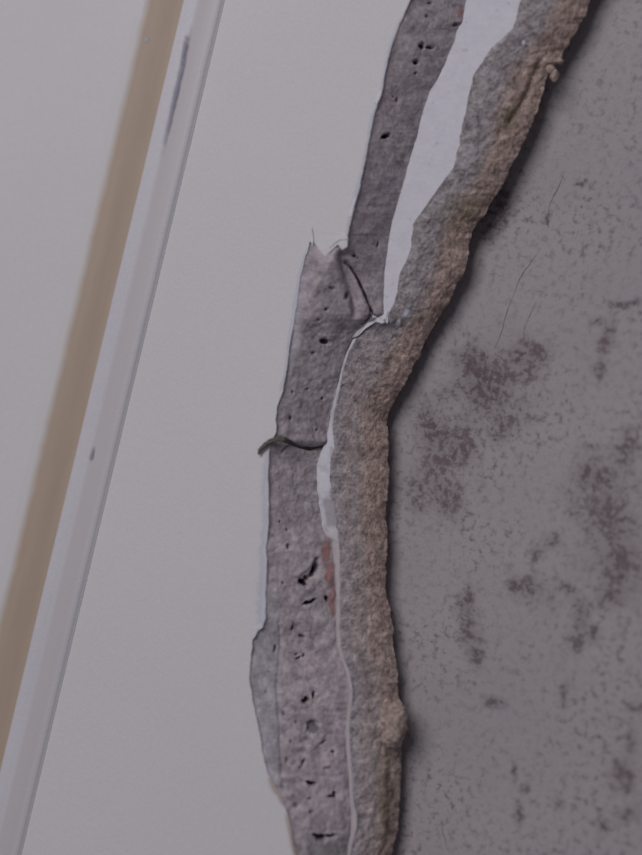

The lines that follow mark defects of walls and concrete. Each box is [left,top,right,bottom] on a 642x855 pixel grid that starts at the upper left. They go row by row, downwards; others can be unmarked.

water stain [460,345,545,407]
flaking render [250,0,590,855]
water stain [413,412,474,512]